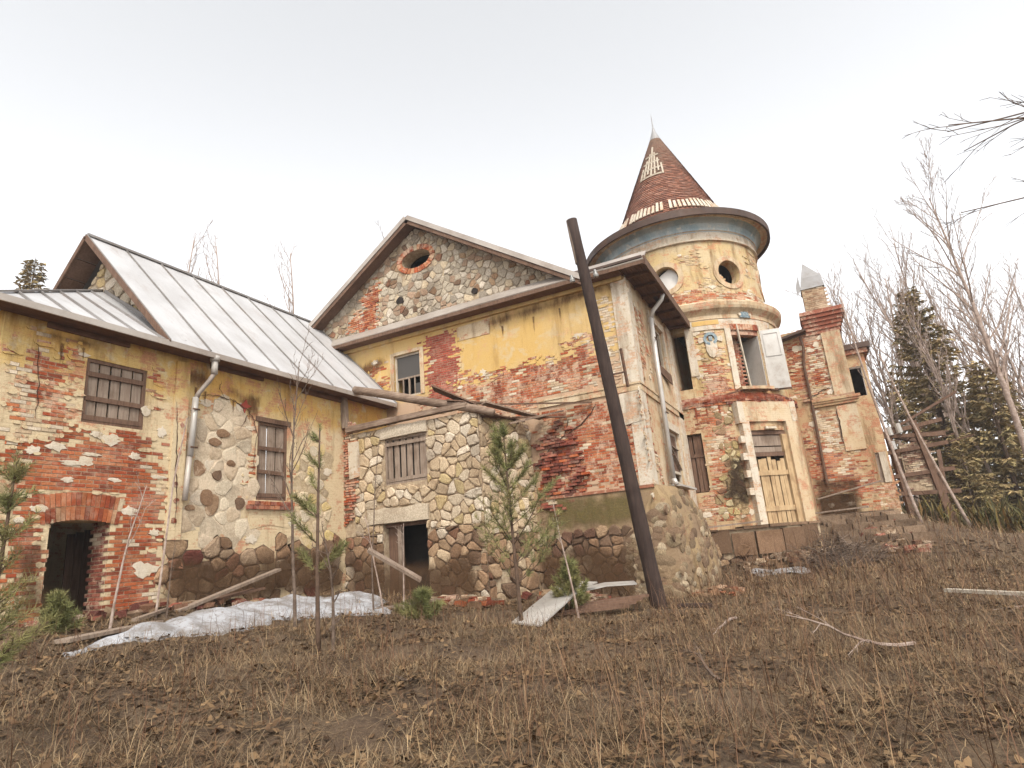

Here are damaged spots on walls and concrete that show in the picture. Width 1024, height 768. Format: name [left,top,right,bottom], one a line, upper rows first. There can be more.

flaking render [345,277,383,336]
crack [33,347,41,415]
flaking render [0,325,257,629]
flaking render [417,288,665,517]
flaking render [683,331,754,522]
flaking render [783,329,834,401]
flaking render [801,408,905,514]